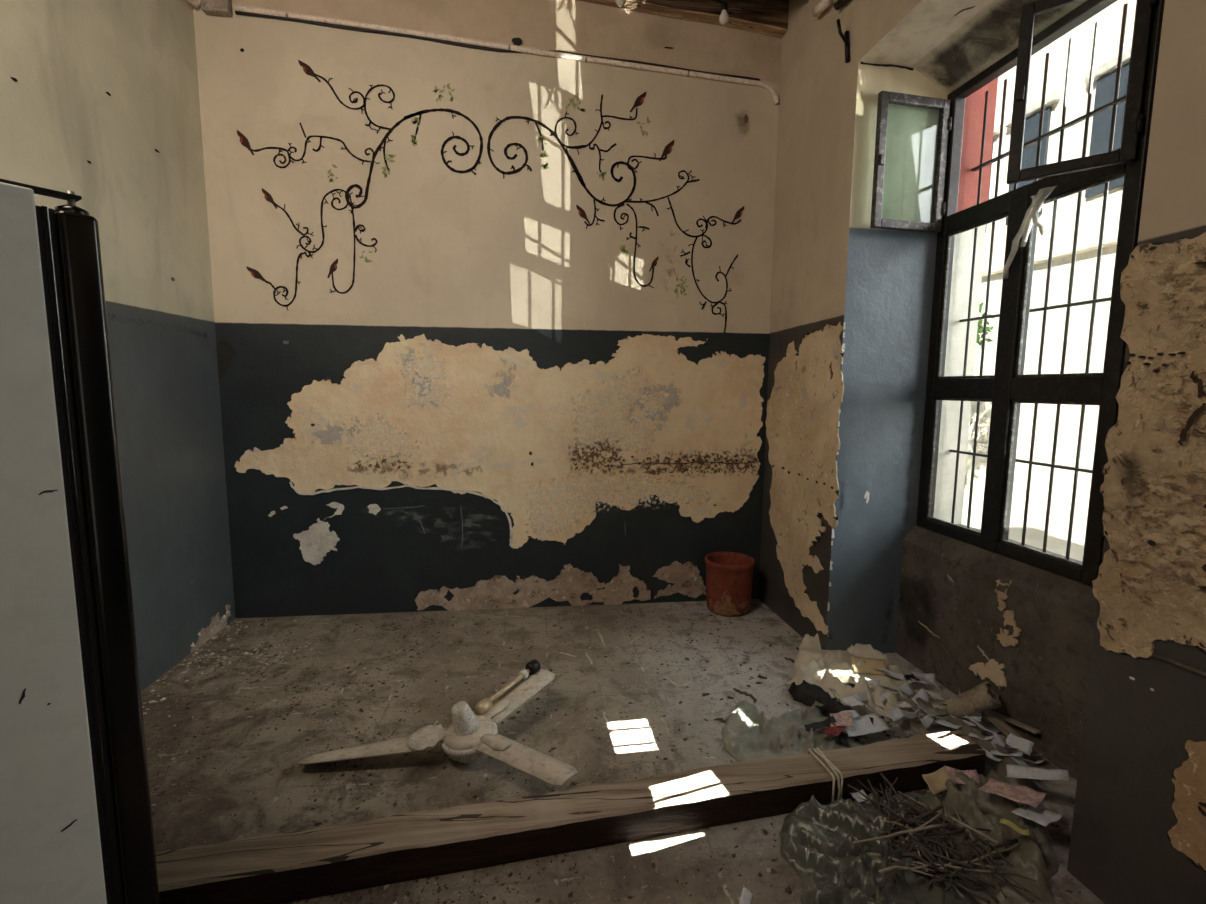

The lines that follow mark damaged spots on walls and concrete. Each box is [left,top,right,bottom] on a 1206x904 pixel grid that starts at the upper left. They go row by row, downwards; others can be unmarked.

peeling [235,322,846,639]
peeling [1092,232,1206,658]
spalling [191,604,231,653]
peeling [966,579,1023,691]
spalling [1166,740,1206,872]